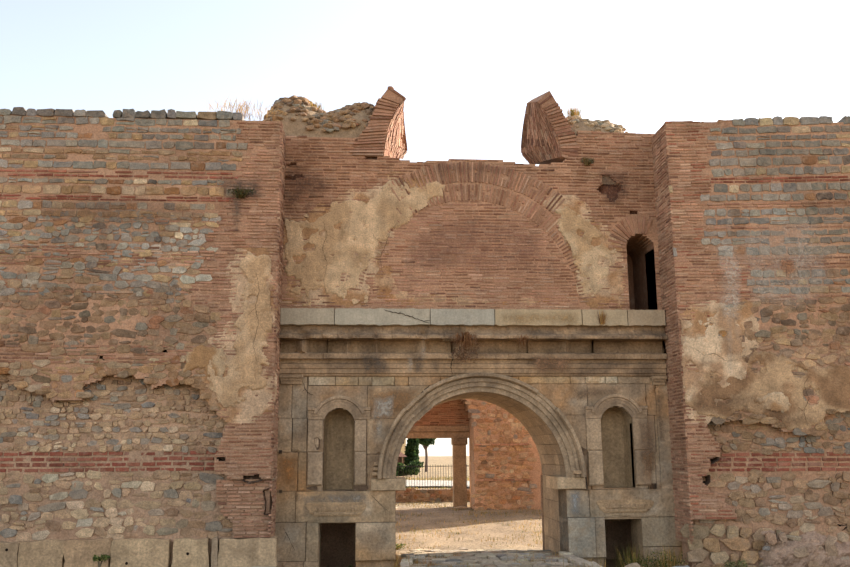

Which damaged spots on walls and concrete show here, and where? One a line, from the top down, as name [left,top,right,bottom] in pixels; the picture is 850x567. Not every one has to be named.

peeling [180,171,507,424]
peeling [540,195,626,309]
peeling [679,299,850,434]